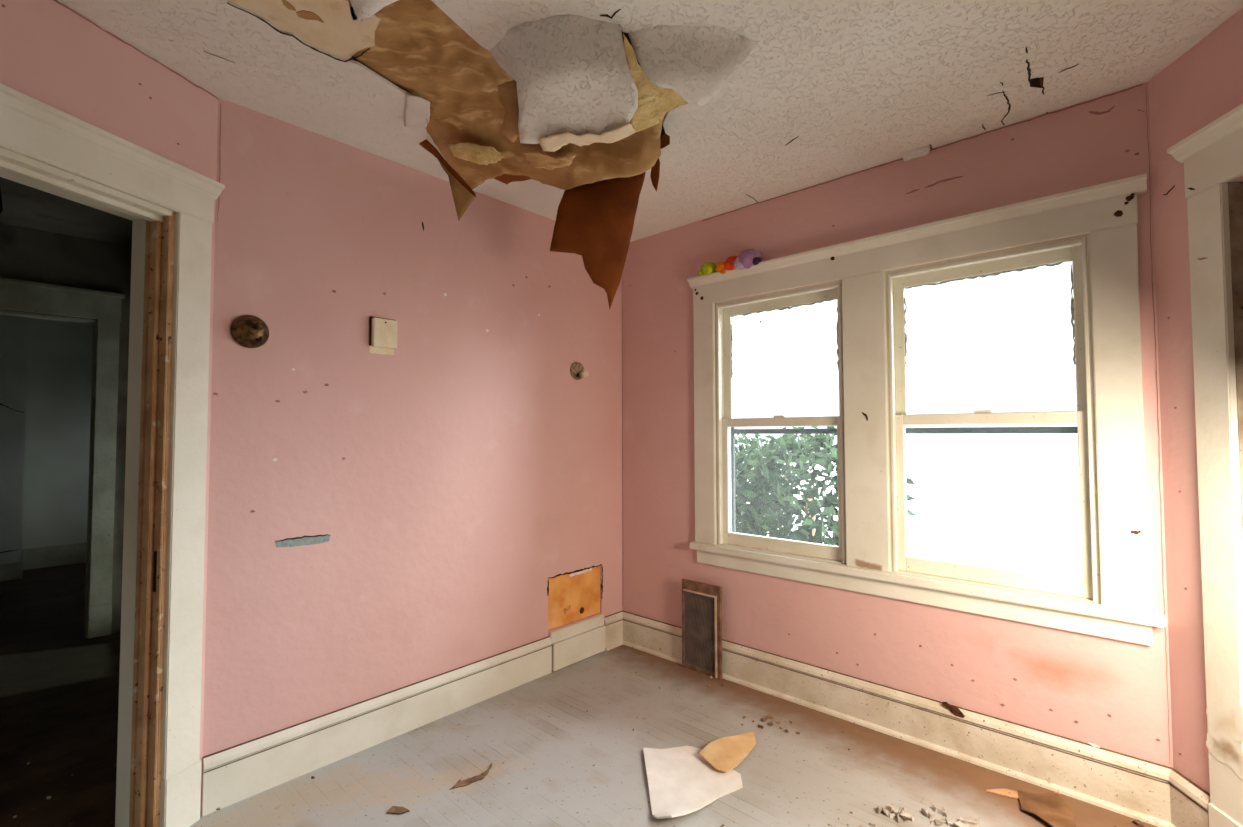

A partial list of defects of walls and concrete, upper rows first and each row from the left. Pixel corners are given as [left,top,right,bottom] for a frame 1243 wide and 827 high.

peeling [227,0,380,62]
crack [702,47,1170,749]